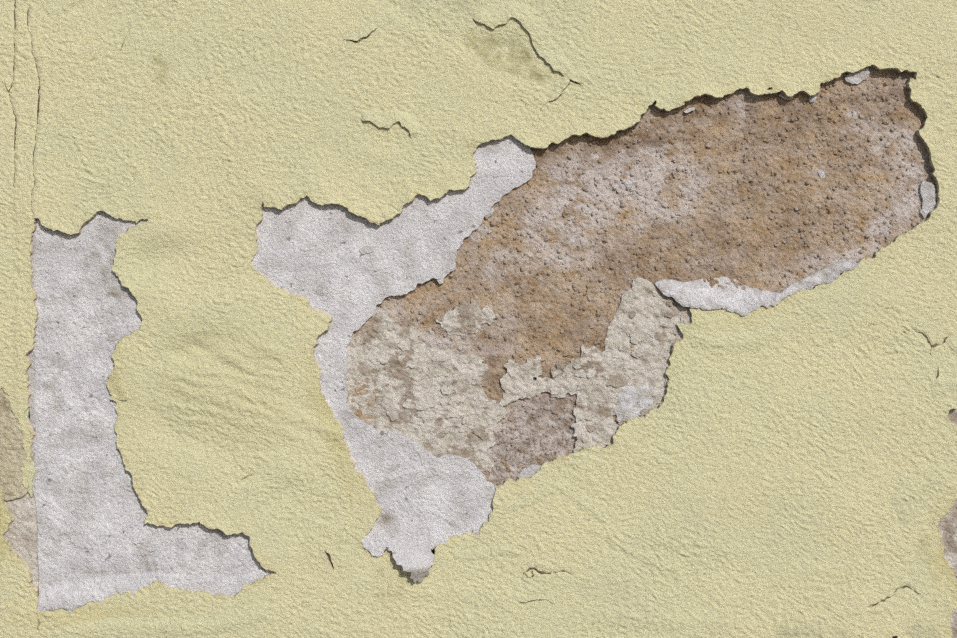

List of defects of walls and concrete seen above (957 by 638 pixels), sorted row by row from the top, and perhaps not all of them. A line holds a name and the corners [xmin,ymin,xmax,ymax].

crack [4,0,40,218]
peeling [472,1,588,110]
flaking render [0,211,276,613]
flaking render [251,66,938,582]
spalling [947,409,957,424]
spalling [932,499,957,579]